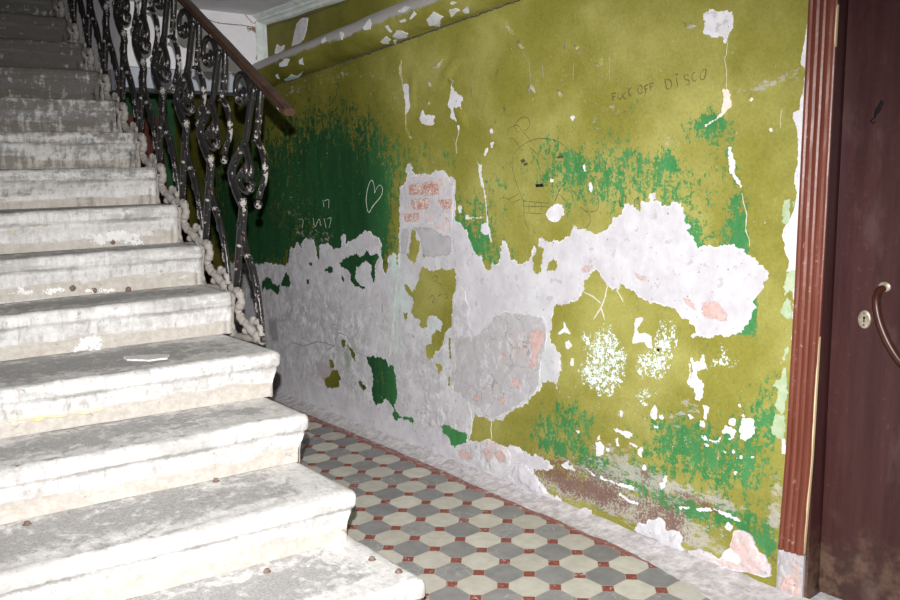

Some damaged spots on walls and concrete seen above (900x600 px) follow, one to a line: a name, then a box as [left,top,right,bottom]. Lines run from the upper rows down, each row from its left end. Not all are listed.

spalling [275,18,308,81]
peeling [380,6,416,44]
peeling [426,1,469,27]
peeling [683,9,734,43]
peeling [399,61,411,115]
peeling [223,128,769,502]
crack [584,286,623,320]
spalling [634,506,772,578]